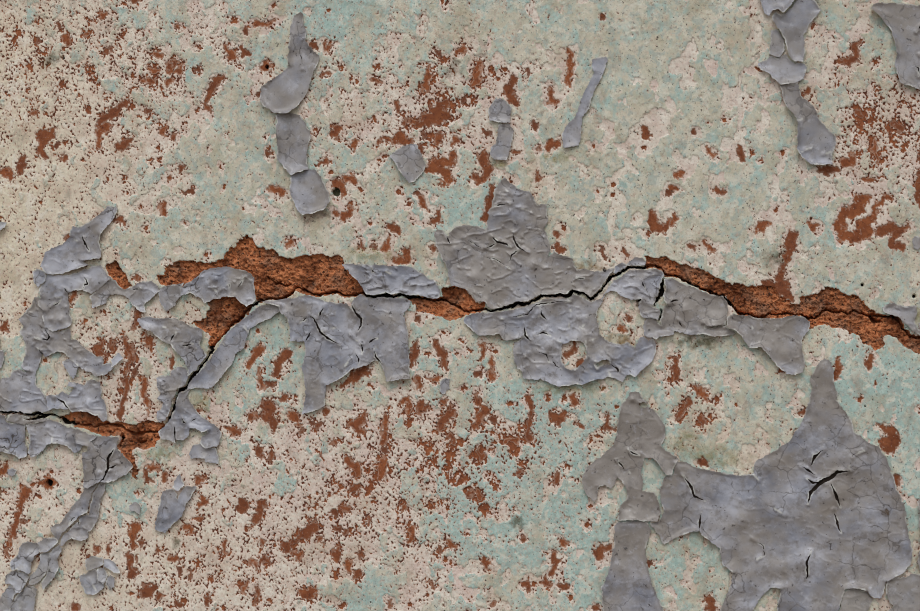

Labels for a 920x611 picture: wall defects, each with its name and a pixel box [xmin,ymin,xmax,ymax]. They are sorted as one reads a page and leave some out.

peeling [377,99,461,188]
peeling [472,74,521,186]
peeling [536,57,608,152]
spalling [665,170,685,197]
peeling [758,0,856,177]
peeling [871,2,920,89]
crack [364,292,425,300]
crack [476,265,733,318]
crack [0,411,77,425]
crack [167,346,215,423]
peeling [0,177,920,611]